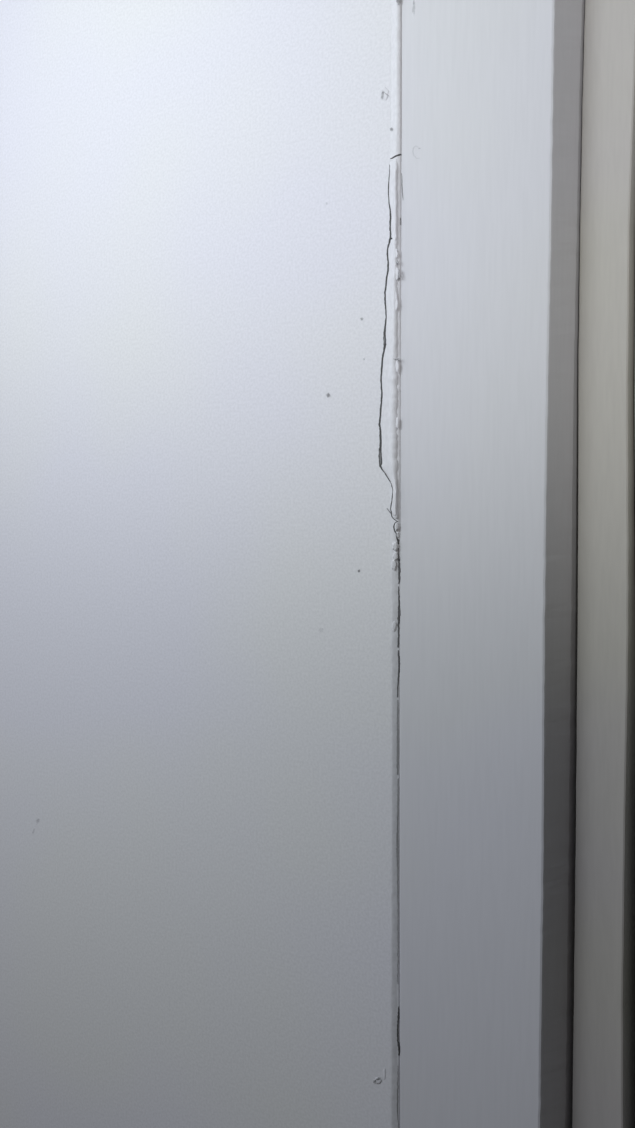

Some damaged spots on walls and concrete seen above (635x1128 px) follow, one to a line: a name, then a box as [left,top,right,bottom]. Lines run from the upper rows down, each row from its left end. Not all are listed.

crack [378,154,403,1128]